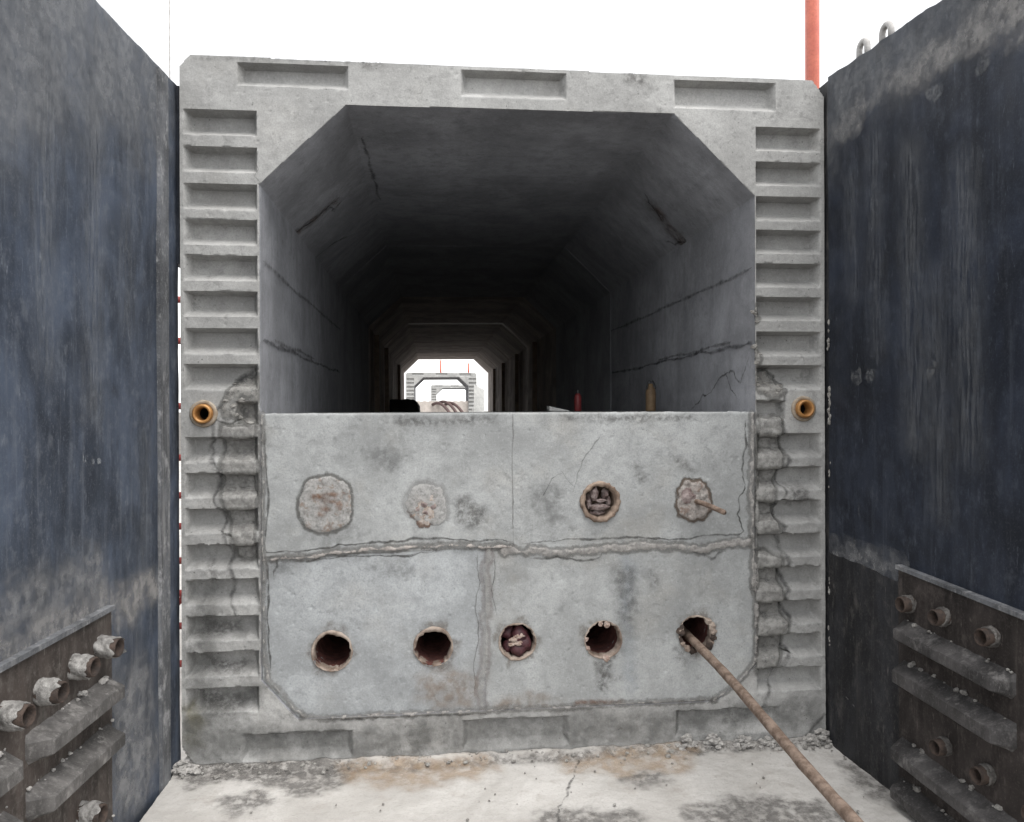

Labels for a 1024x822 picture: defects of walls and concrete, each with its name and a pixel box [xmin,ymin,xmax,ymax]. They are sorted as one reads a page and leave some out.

spalling [222,375,259,424]
crack [612,342,750,405]
spalling [407,495,436,528]
crack [212,369,748,670]